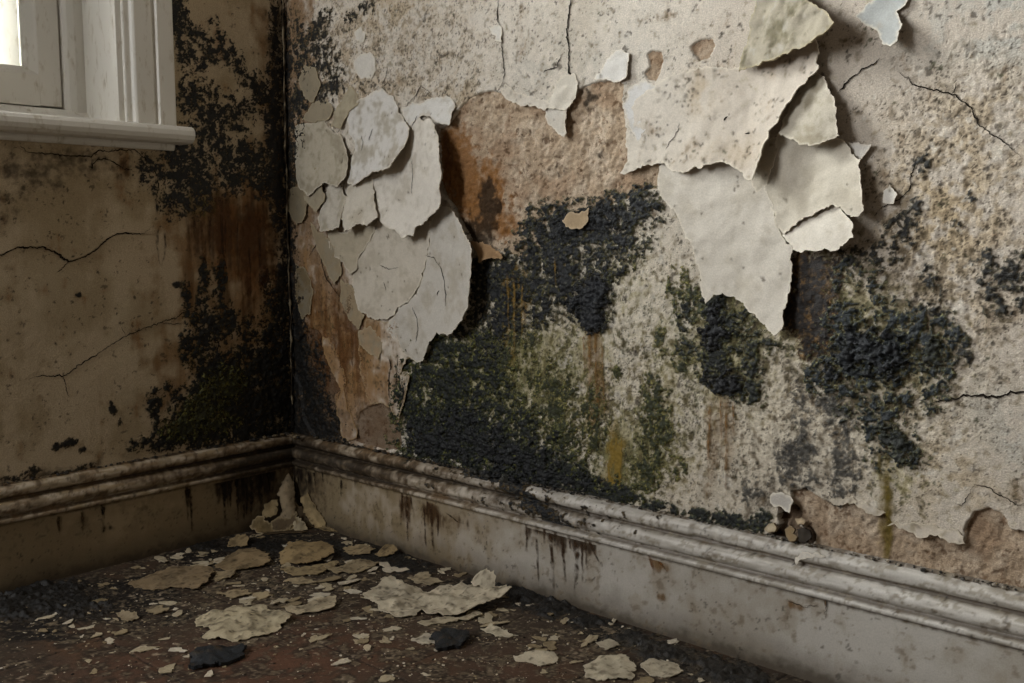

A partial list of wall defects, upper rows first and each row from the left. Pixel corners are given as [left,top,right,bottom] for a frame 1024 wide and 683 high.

crack [544,0,571,75]
peeling [856,0,908,47]
crack [900,73,1021,157]
crack [0,146,159,272]
damp [126,0,375,455]
peeling [288,0,872,450]
damp [970,241,1024,318]
damp [383,182,974,559]
crack [933,390,1024,403]
damp [0,437,95,482]
damp [525,525,598,581]
flaking render [764,489,1024,588]